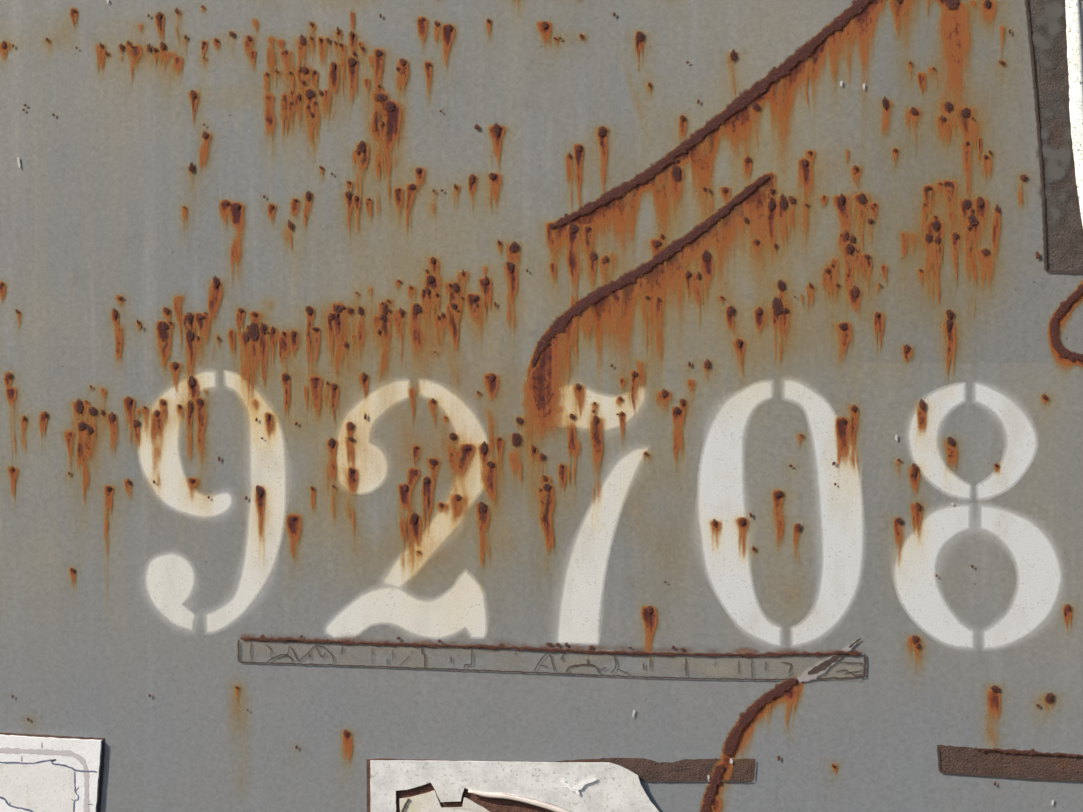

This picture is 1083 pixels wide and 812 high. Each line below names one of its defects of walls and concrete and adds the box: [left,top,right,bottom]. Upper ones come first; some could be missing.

rust [245,485,265,535]
rust [64,240,528,500]
rust [201,11,424,231]
rust [327,413,367,516]
rust [398,383,603,562]
spalling [531,175,769,367]
spalling [556,0,872,226]
rust [752,150,887,358]
rust [832,405,858,465]
rust [893,458,922,560]
rust [901,0,1011,372]
peeling [1024,0,1083,361]